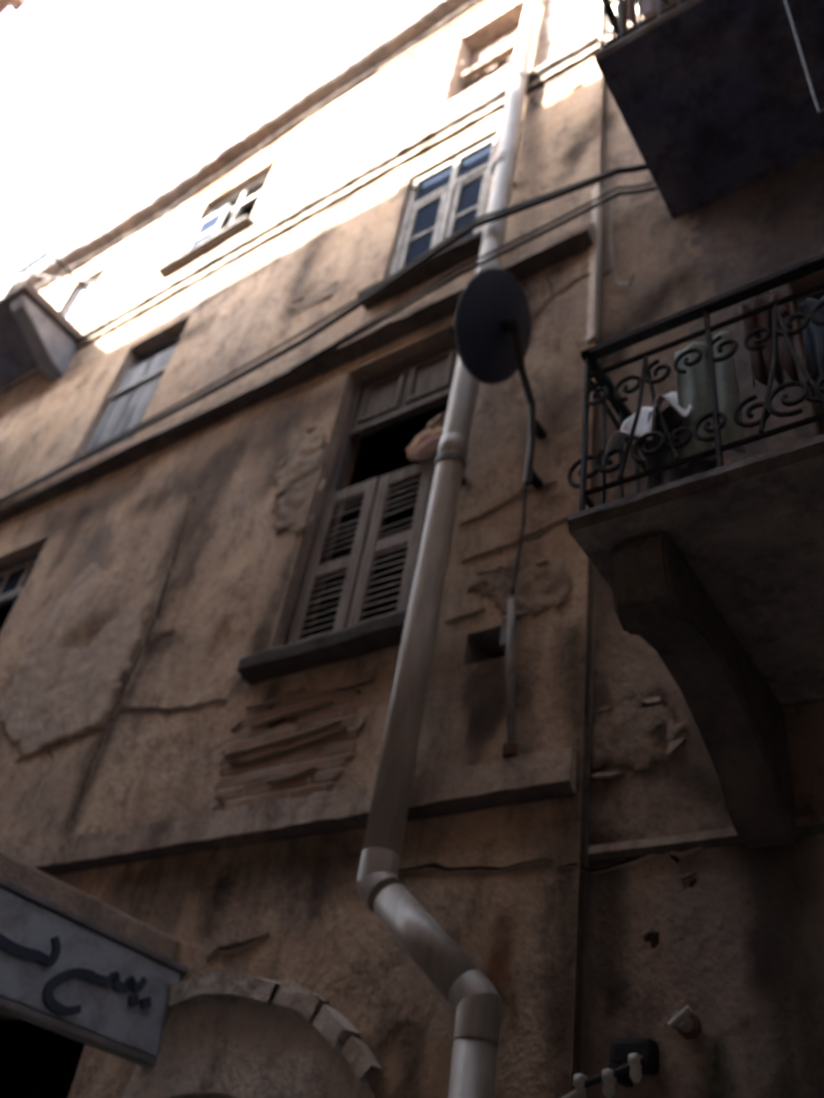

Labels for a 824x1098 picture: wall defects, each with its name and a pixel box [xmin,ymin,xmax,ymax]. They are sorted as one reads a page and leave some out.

crack [15,485,227,829]
water stain [65,394,335,832]
flaking render [210,686,365,811]
crack [398,847,702,875]